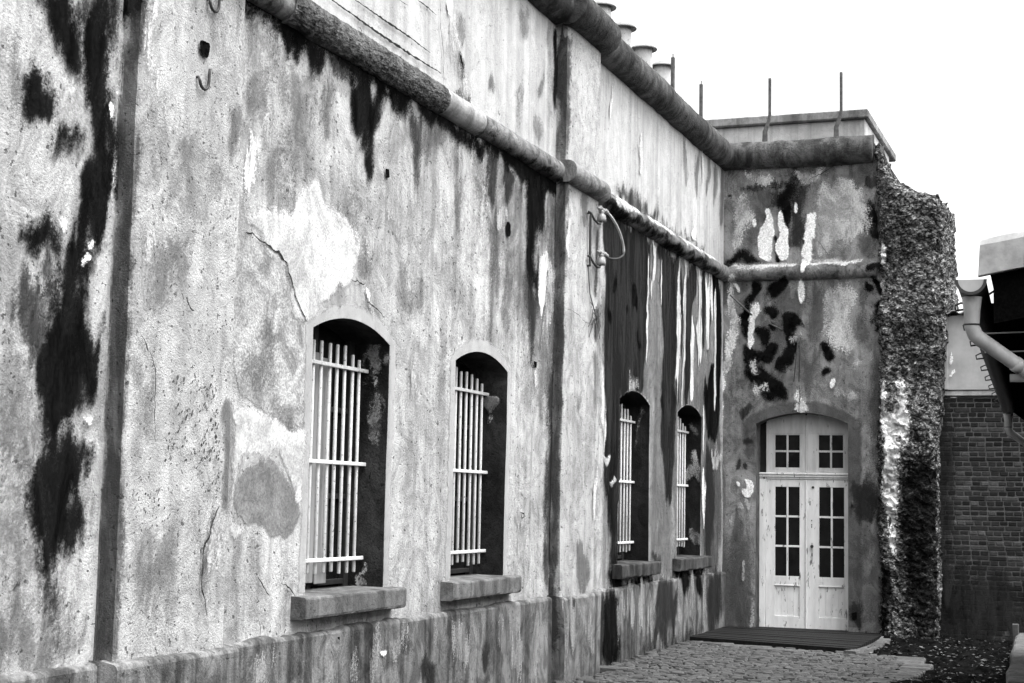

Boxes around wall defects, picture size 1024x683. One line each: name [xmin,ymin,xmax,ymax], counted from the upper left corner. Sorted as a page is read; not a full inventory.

damp [0,0,161,669]
crack [201,507,219,614]
damp [245,0,835,666]
damp [854,175,886,332]